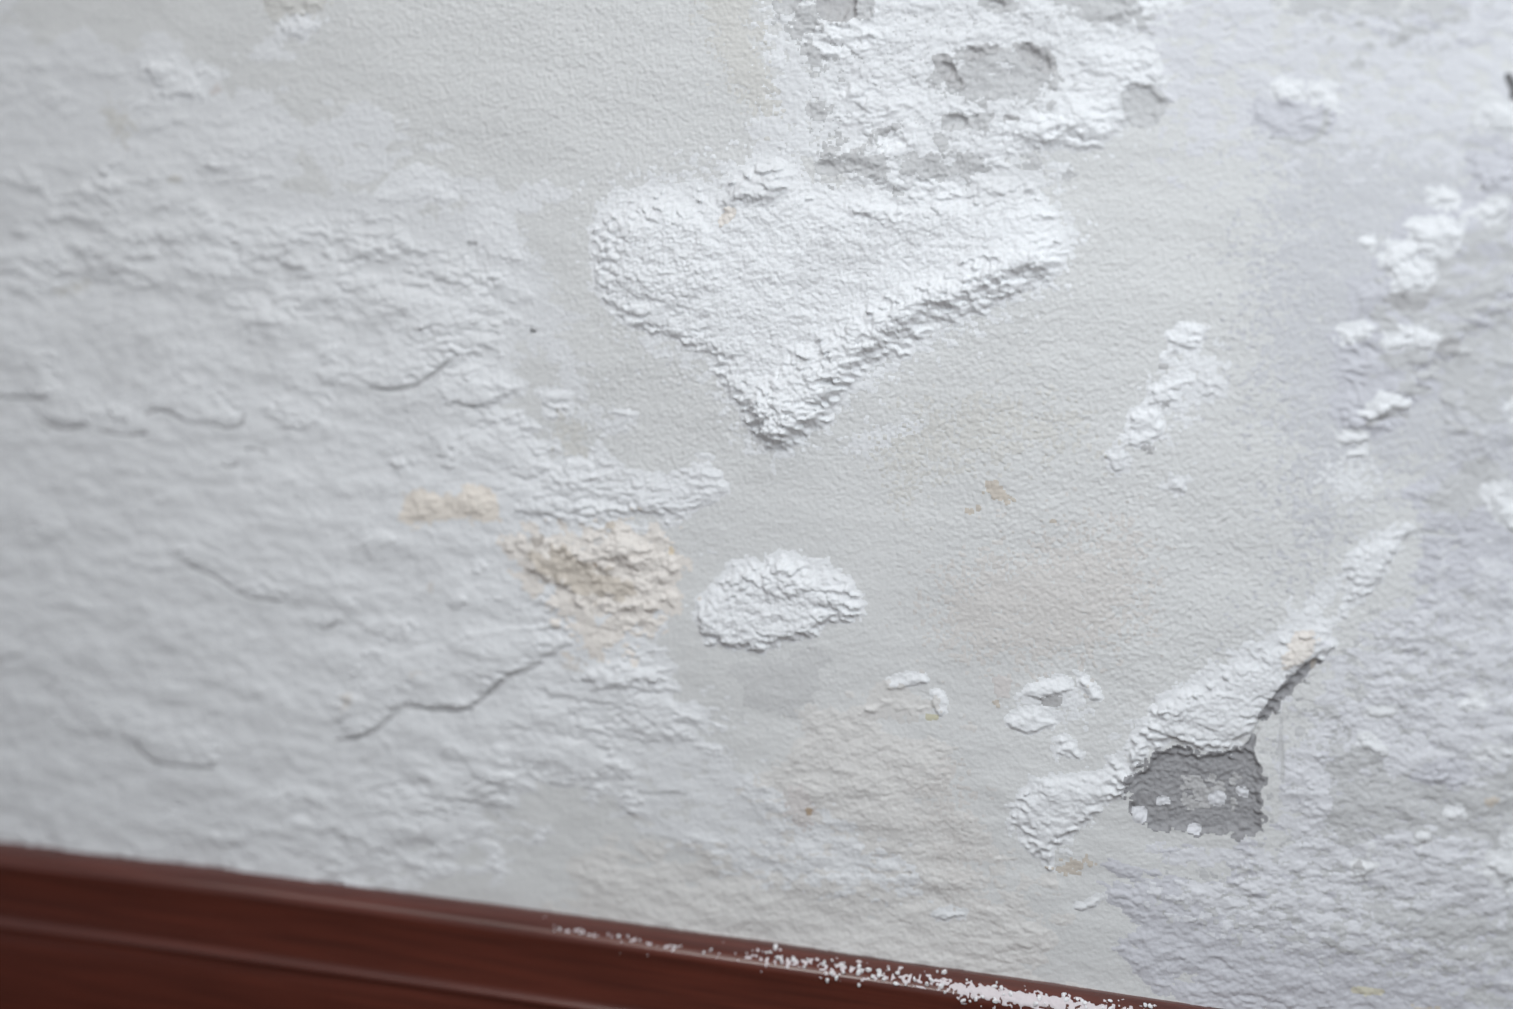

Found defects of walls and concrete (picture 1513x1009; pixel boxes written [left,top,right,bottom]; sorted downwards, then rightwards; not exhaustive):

leakage [0,208,1076,981]
leakage [572,0,1513,1009]
flaking render [1123,569,1513,995]